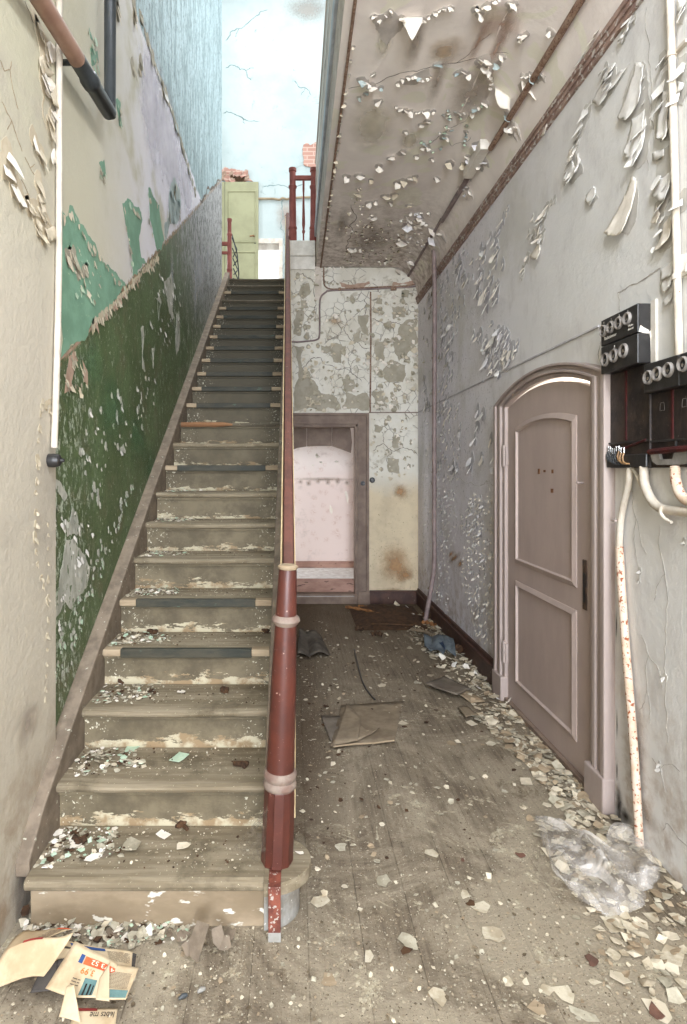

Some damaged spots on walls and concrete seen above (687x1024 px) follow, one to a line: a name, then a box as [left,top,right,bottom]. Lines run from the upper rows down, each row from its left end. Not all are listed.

peeling [369,5,455,45]
peeling [470,0,519,23]
peeling [517,30,530,44]
peeling [617,11,637,44]
peeling [675,0,687,26]
peeling [520,49,687,305]
peeling [0,3,181,456]
crack [296,300,401,385]
peeling [292,45,546,644]
peeling [34,396,52,496]
peeling [79,448,106,509]
peeling [33,480,134,704]